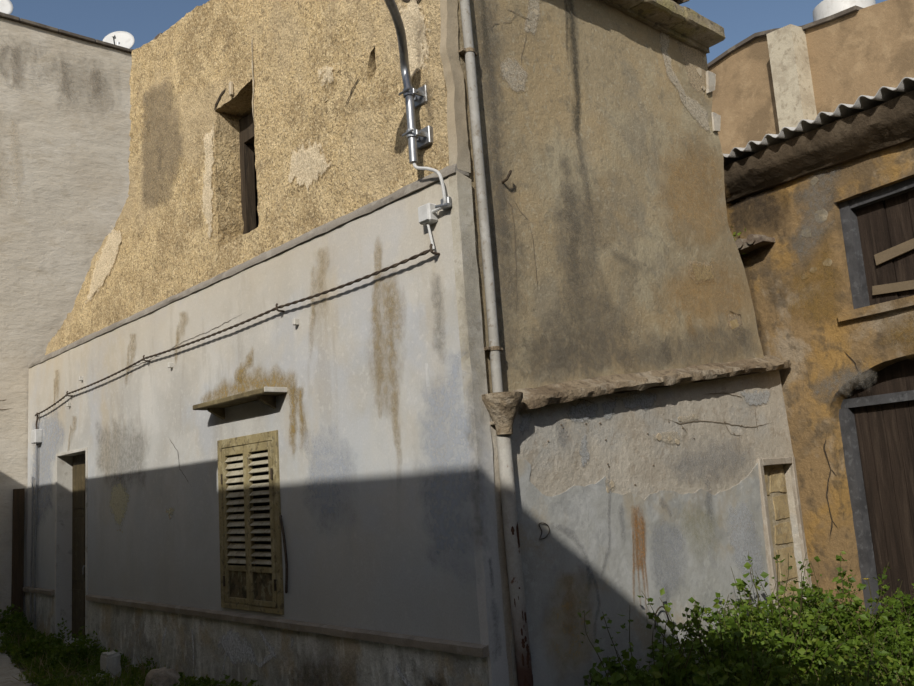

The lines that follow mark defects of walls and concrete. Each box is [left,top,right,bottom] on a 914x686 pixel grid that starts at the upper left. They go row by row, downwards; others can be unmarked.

flaking render [660,32,709,130]
crack [667,393,768,436]
corrosion [633,510,647,587]